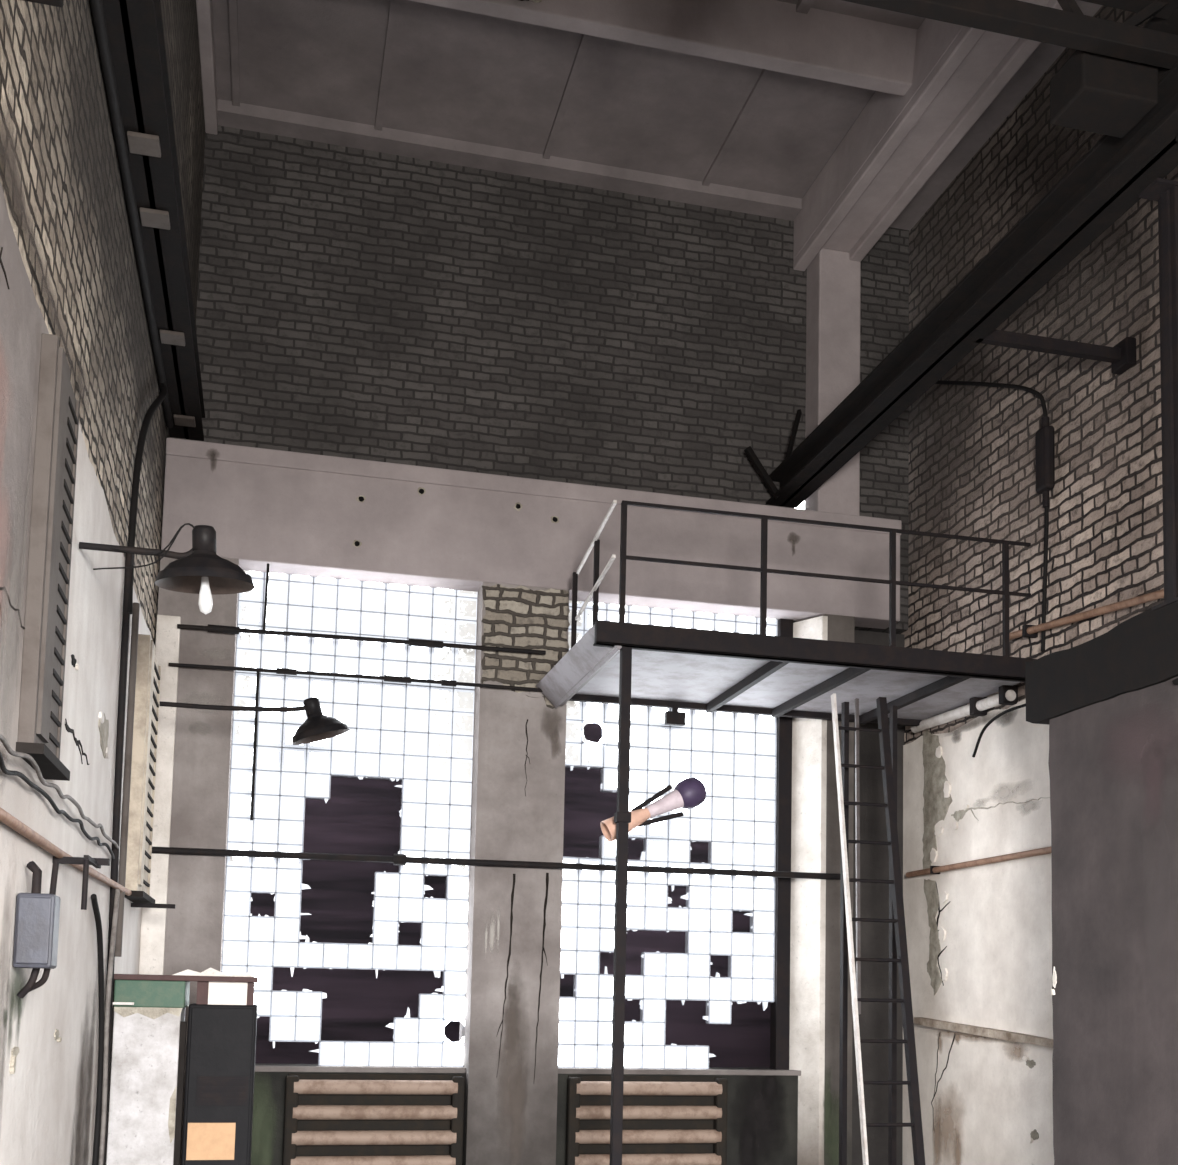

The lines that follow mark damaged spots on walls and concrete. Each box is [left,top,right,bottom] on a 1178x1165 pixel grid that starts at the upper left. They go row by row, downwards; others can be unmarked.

crack [0,247,9,289]
crack [0,586,25,629]
crack [65,719,89,765]
crack [951,797,1050,821]
peeling [922,730,969,995]
crack [496,874,516,1077]
crack [534,873,549,1079]
damp [934,1106,960,1165]